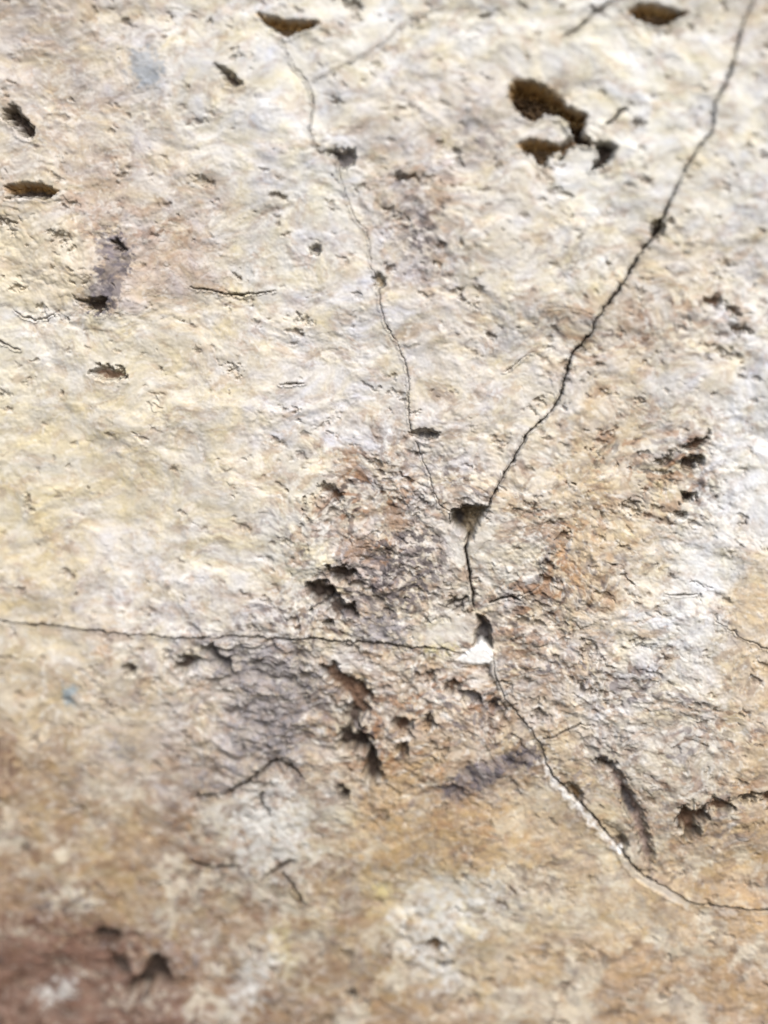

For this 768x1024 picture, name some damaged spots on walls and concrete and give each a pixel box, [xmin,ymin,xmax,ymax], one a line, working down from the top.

spalling [505,76,619,171]
crack [0,337,22,353]
crack [12,309,57,323]
crack [188,285,277,299]
crack [277,4,544,610]
crack [485,0,756,510]
peeling [438,504,497,571]
spalling [305,563,358,625]
peeling [415,606,509,707]
spalling [318,660,382,780]
crack [0,618,768,919]
spalling [391,711,437,753]